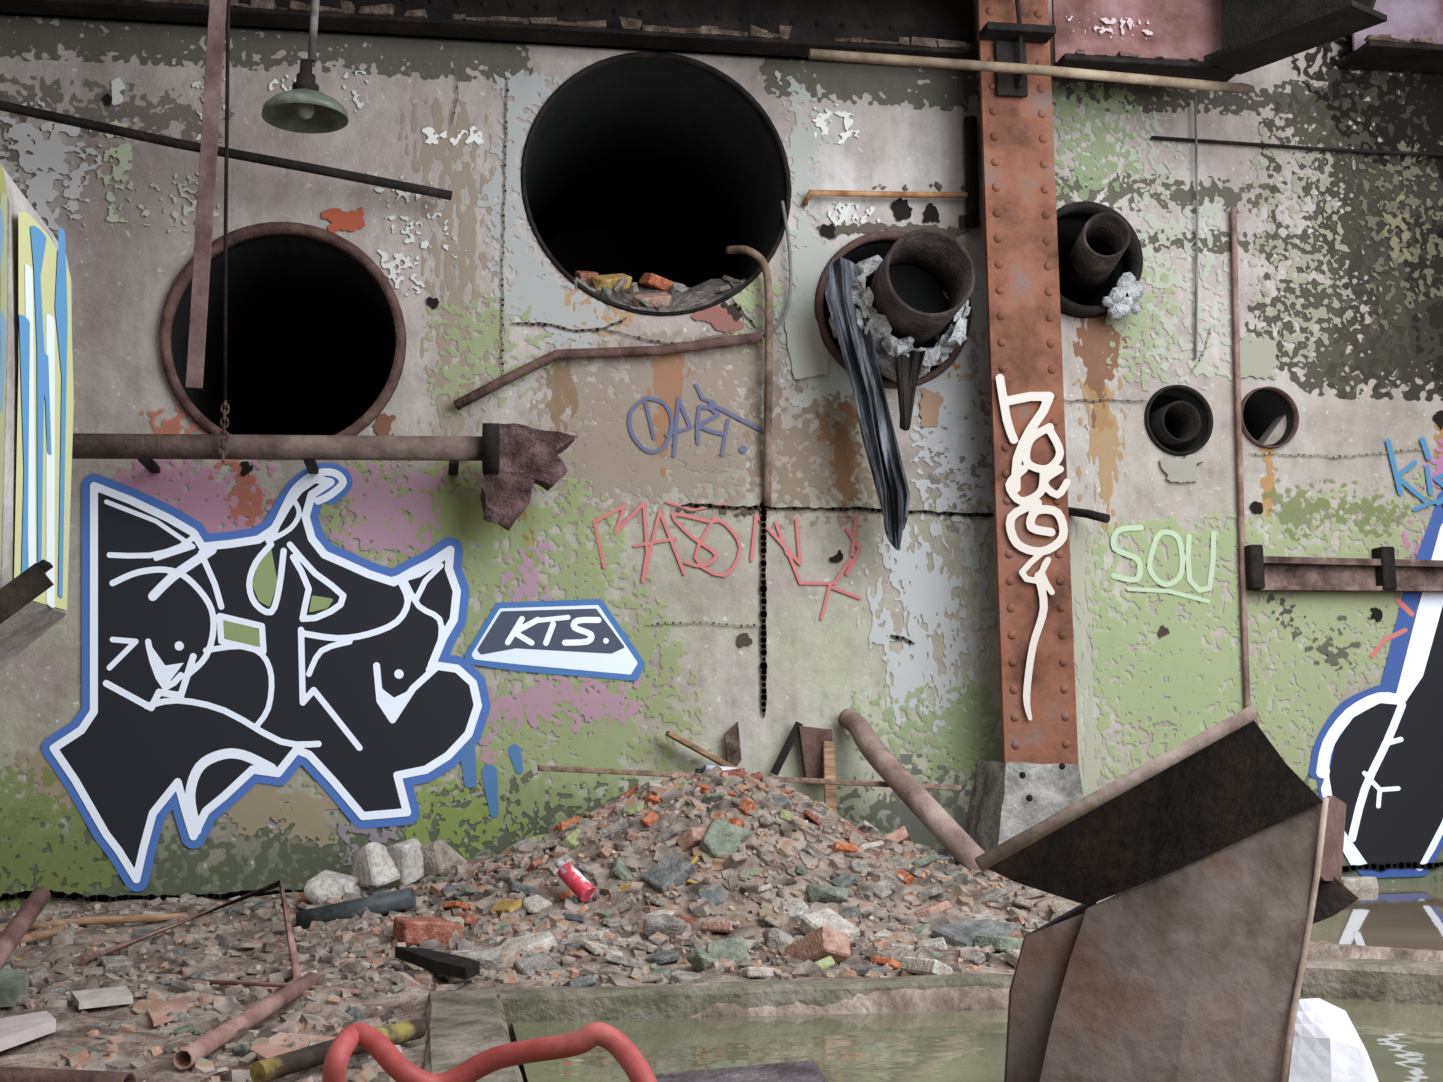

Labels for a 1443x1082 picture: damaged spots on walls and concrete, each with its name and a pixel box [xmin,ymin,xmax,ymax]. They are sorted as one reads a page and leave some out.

corrosion [1364,34,1433,44]
peeling [343,71,368,113]
peeling [422,126,484,146]
peeling [0,78,199,238]
spalling [321,207,365,233]
peeling [367,172,466,296]
corrosion [1071,313,1127,533]